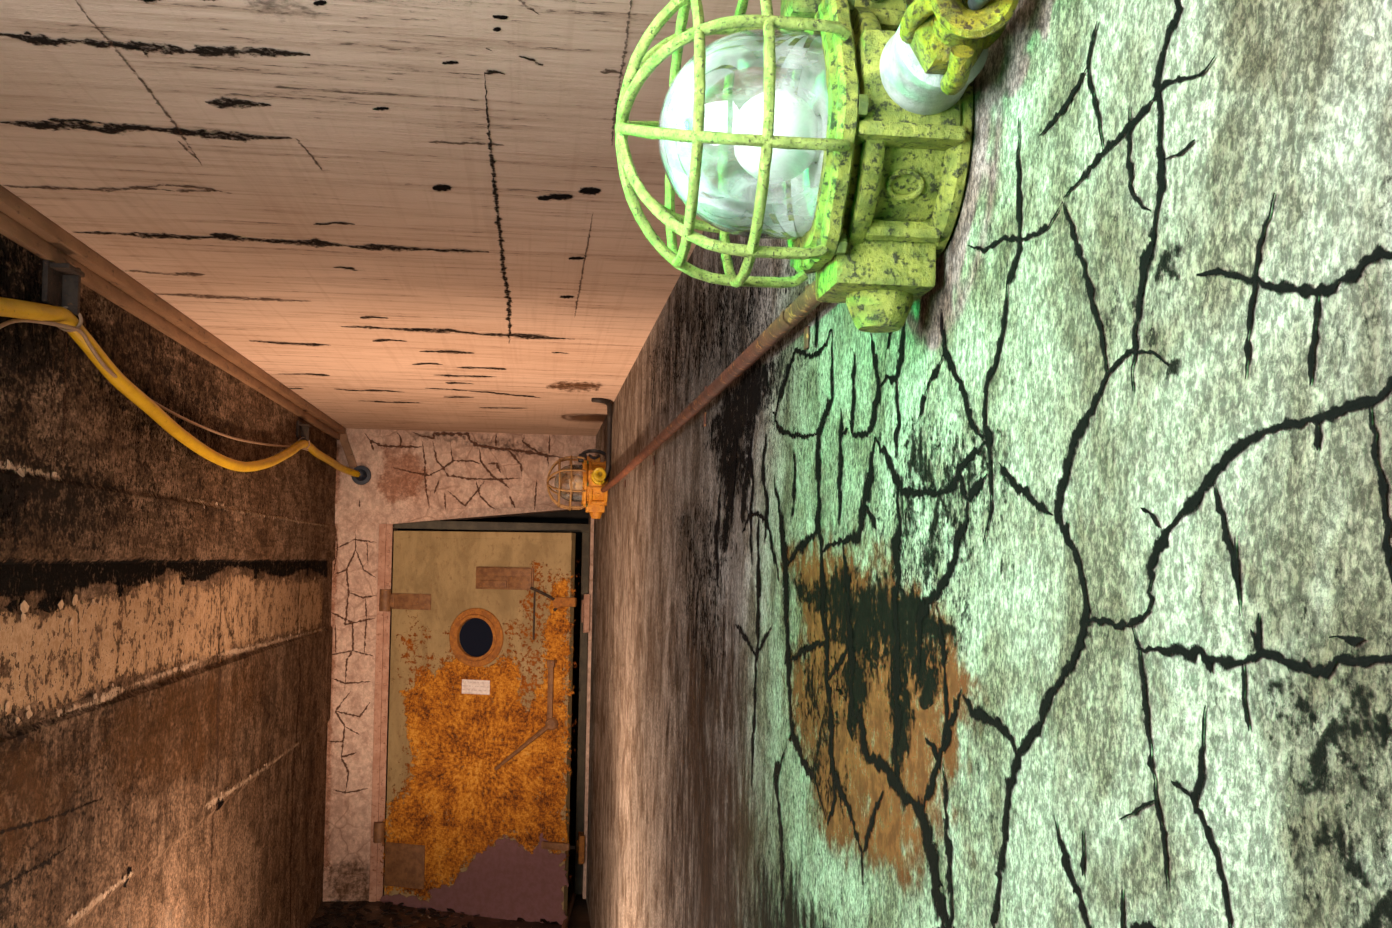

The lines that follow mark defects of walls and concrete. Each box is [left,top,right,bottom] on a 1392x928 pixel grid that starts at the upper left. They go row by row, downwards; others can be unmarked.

crack [0,0,322,194]
peeling [0,573,323,724]
crack [73,56,593,510]
crack [289,500,377,924]
rust [377,560,577,900]
leakage [648,235,805,420]
leakage [665,352,832,928]
leakage [780,418,1007,890]
crack [714,0,1392,928]
leakage [1265,673,1392,928]